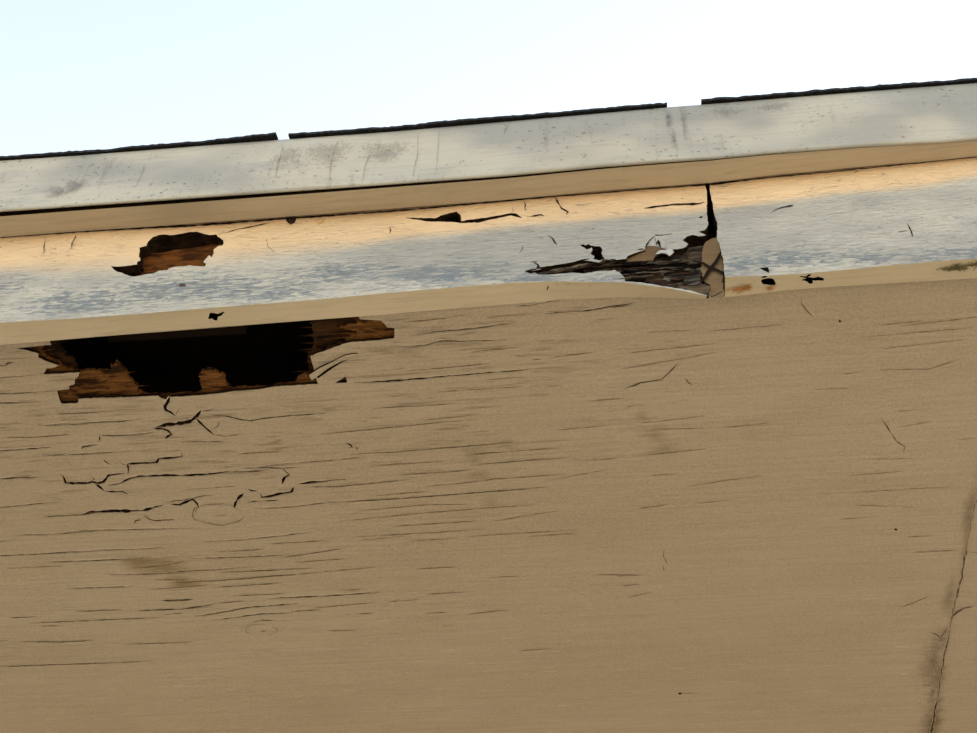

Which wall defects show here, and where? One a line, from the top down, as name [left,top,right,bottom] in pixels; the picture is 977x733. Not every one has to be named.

crack [0,157,973,254]
peeling [626,237,680,266]
peeling [699,206,724,297]
spalling [57,312,314,393]
crack [815,317,975,390]
crack [0,283,642,667]
crack [913,494,977,733]